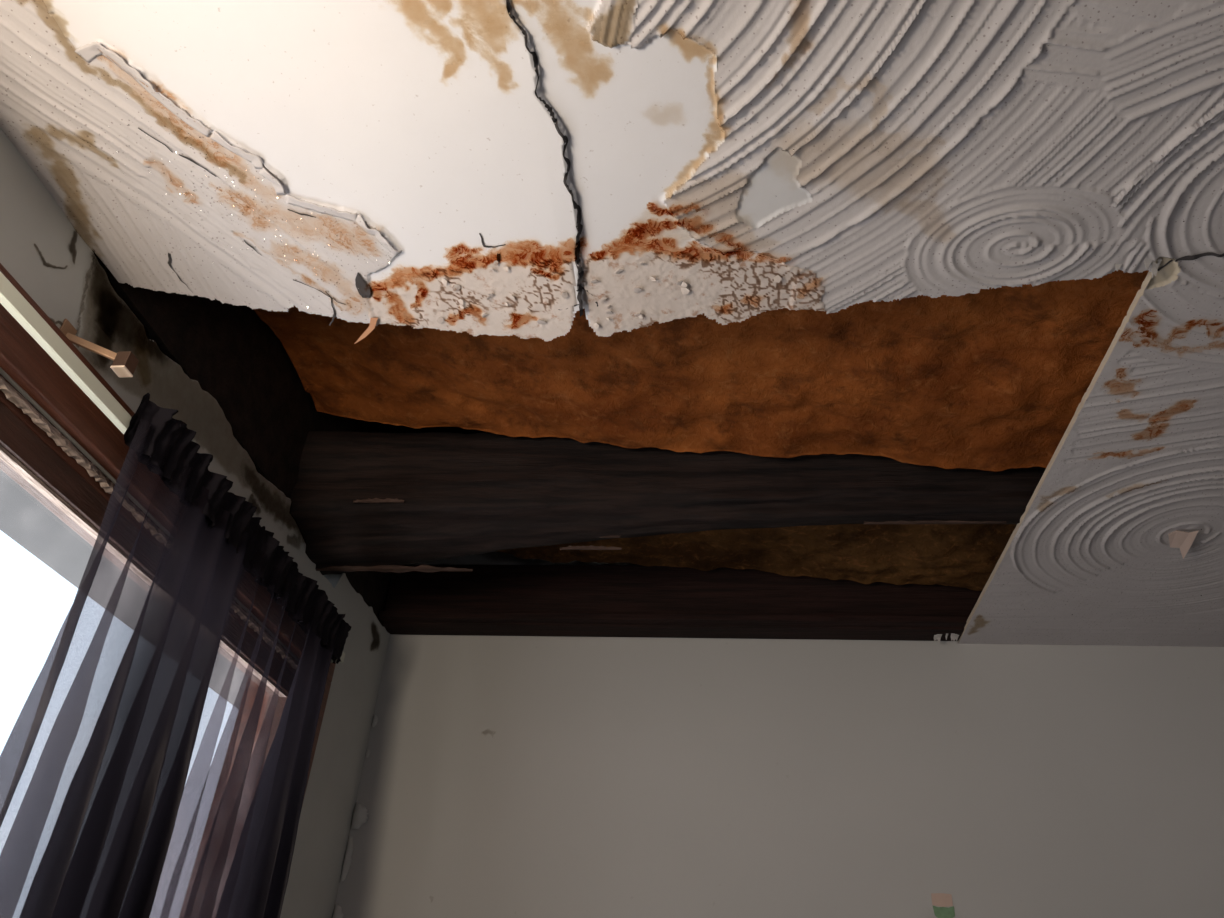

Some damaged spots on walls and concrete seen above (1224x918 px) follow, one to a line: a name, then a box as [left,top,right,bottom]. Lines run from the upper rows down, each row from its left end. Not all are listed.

flaking render [43,0,788,334]
crack [407,0,598,327]
flaking render [736,148,813,229]
rust [366,202,764,322]
crack [657,252,824,322]
crack [1157,252,1224,271]
rust [1120,310,1159,347]
rust [1172,320,1224,338]